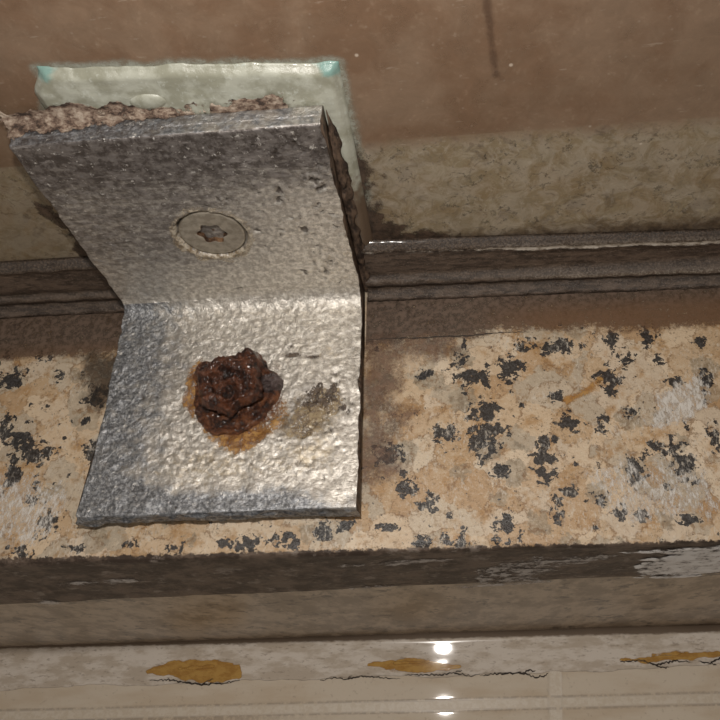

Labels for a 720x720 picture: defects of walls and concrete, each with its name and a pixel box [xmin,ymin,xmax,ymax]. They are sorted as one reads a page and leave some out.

peeling [210,93,288,113]
damp [362,288,720,483]
rust [182,347,347,455]
rust [146,659,242,683]
rust [368,658,461,673]
crack [321,669,548,681]
rust [620,651,720,664]
crack [620,657,720,669]